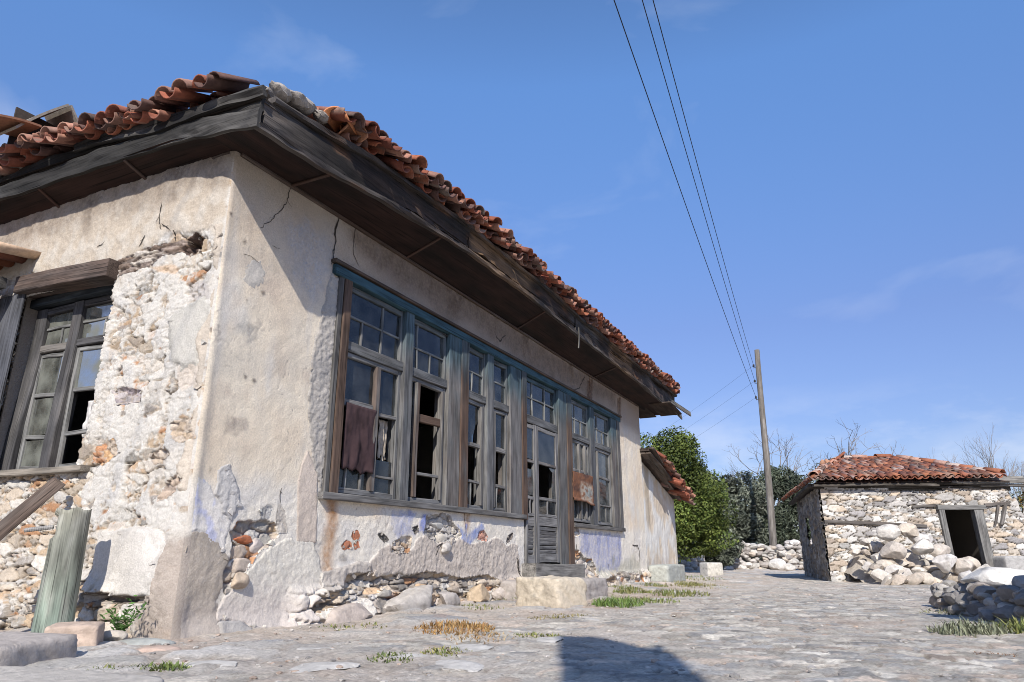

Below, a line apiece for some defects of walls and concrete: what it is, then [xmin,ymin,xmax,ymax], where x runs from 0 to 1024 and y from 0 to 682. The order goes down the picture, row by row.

crack [139,203,176,246]
crack [245,188,292,263]
spalling [117,223,223,277]
spalling [111,386,142,405]
spalling [91,438,120,466]
spalling [149,289,287,594]
spalling [341,530,360,550]
spalling [378,512,462,554]
flaking render [81,526,166,605]